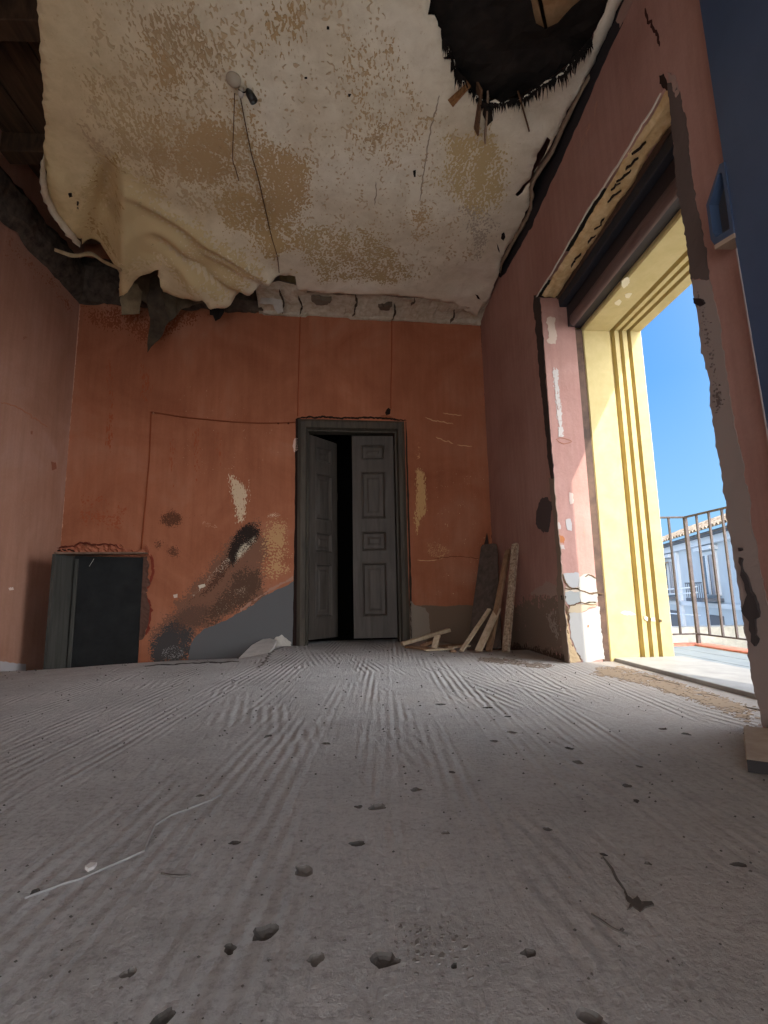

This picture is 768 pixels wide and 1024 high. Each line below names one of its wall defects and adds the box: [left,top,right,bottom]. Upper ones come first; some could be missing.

crack [645,8,660,46]
water stain [0,0,517,344]
crack [279,290,358,317]
crack [387,295,418,320]
flaking render [659,74,768,727]
water stain [158,508,183,528]
peeling [227,474,251,524]
peeling [413,446,428,534]
flaking render [533,295,605,663]
water stain [193,538,256,596]
water stain [738,557,761,646]
flaking render [275,635,291,647]